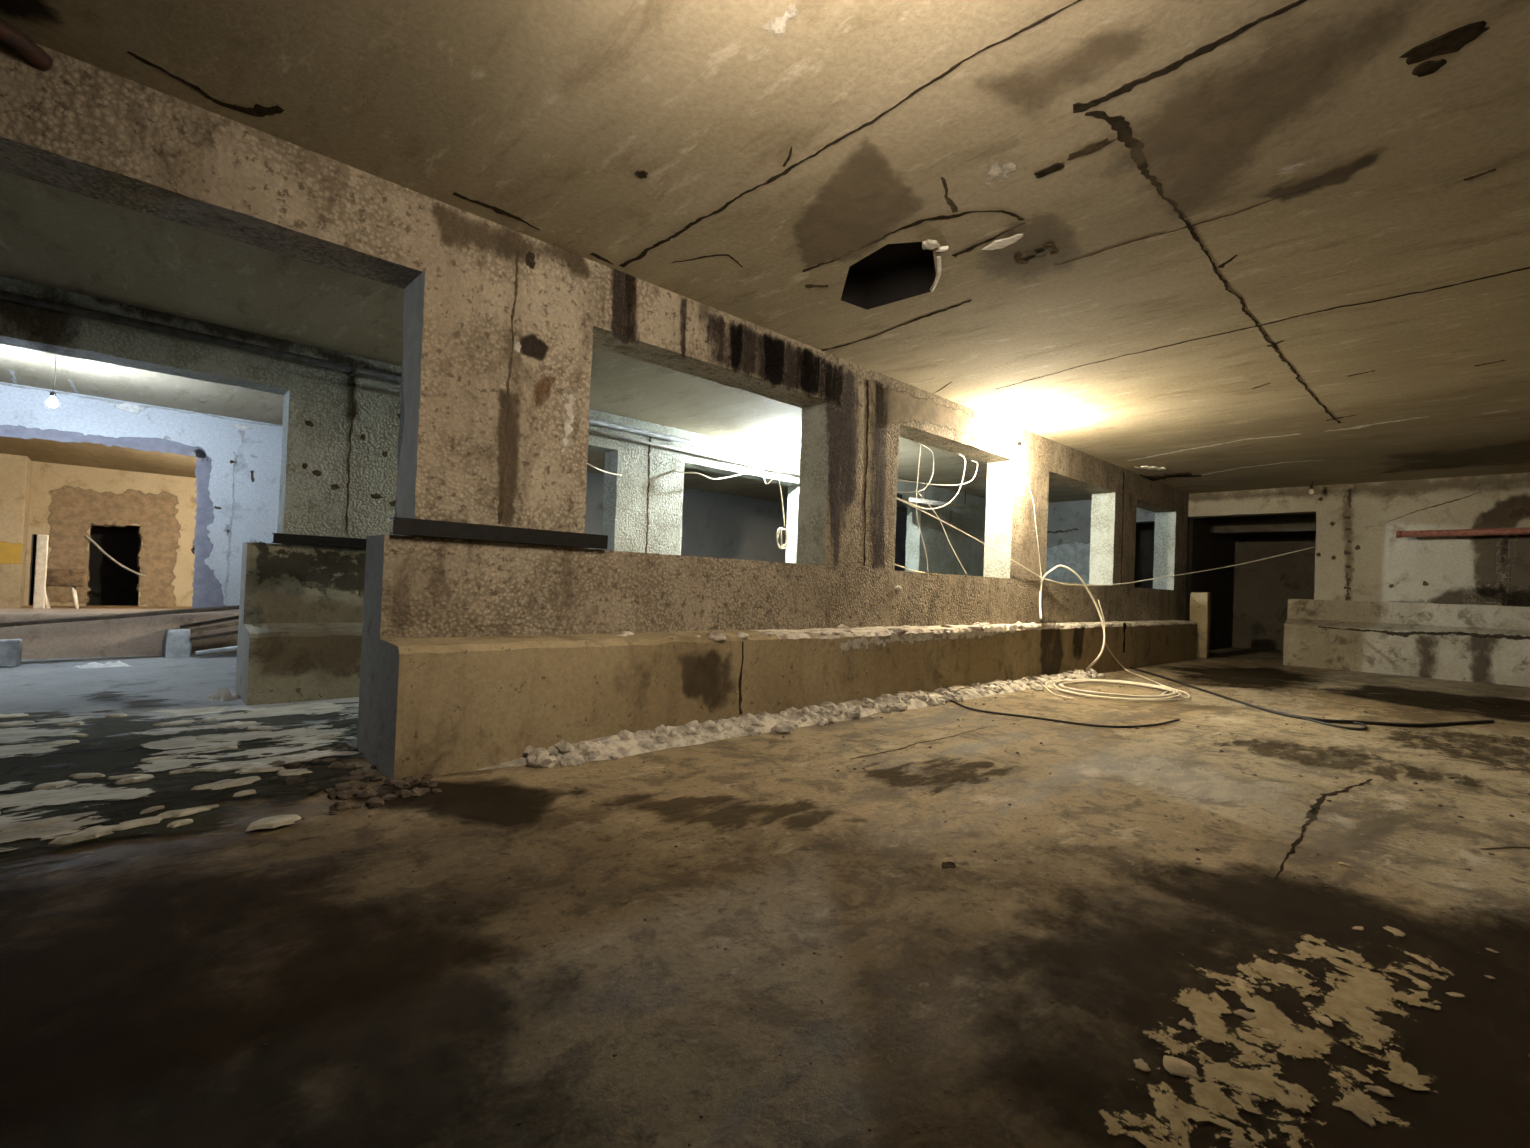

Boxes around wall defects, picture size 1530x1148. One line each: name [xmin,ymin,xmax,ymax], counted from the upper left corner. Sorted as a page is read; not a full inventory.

crack [589,0,1081,268]
crack [802,259,838,289]
crack [821,300,972,351]
crack [972,0,1530,441]
crack [0,370,282,605]
crack [644,436,652,553]
crack [862,380,870,566]
leakage [1128,433,1300,461]
leakage [1189,441,1530,607]
crack [1388,492,1481,522]
leakage [1159,635,1530,786]
crack [1276,779,1372,876]